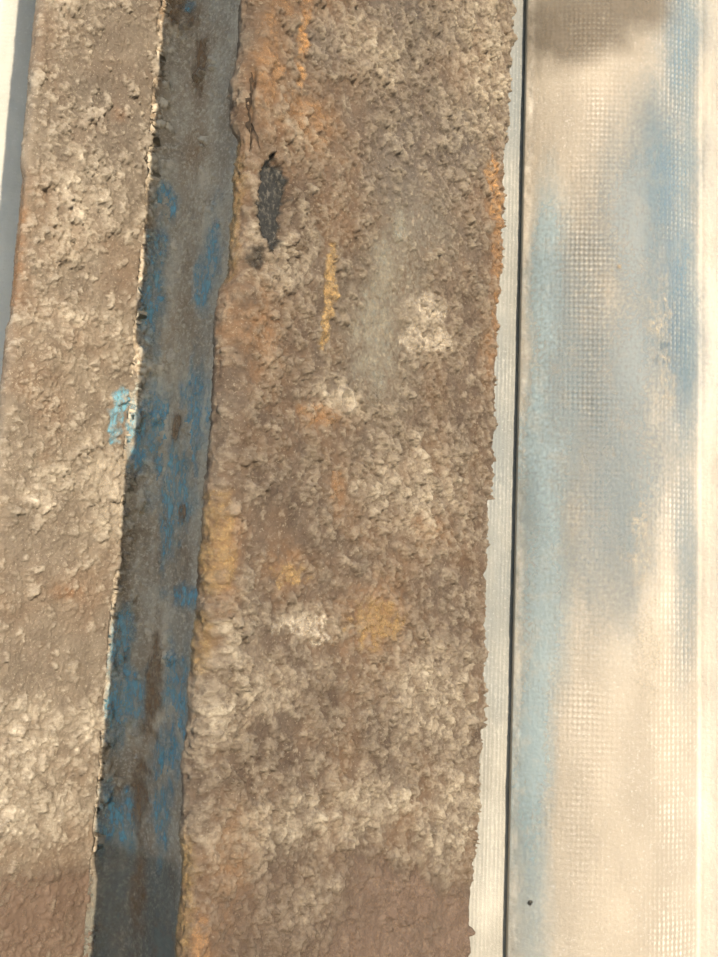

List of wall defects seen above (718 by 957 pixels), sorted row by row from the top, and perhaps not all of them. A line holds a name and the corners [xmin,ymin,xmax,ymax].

crack [245,72,260,152]
spalling [255,152,288,252]
peeling [108,376,210,556]
peeling [106,611,142,727]